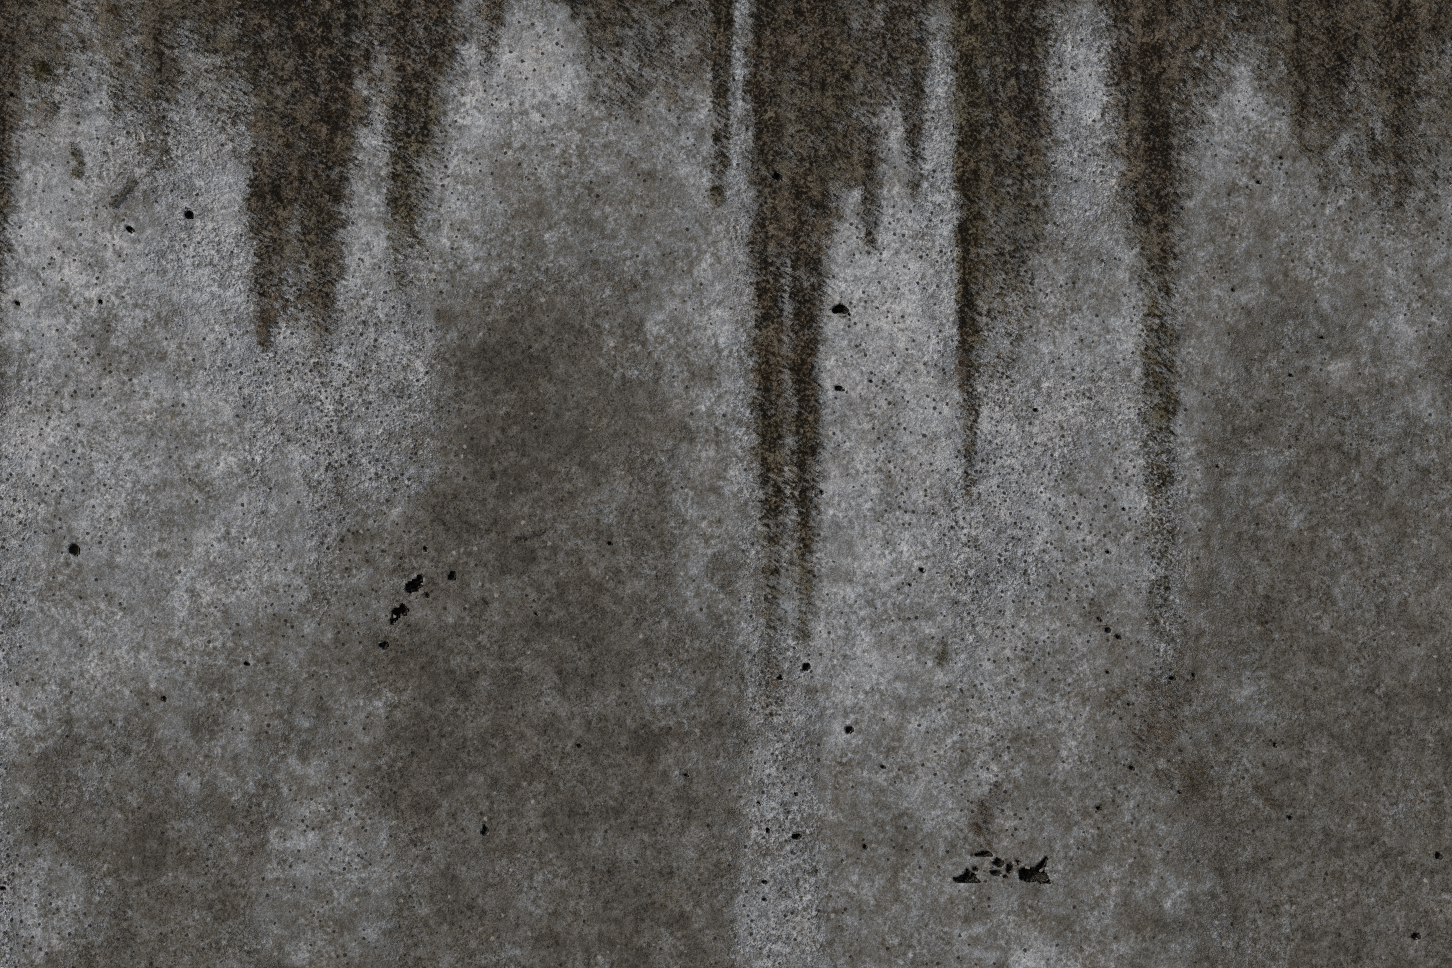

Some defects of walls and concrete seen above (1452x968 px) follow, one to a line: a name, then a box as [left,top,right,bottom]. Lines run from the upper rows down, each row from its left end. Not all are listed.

leakage [473,0,507,76]
leakage [541,0,589,23]
leakage [706,548,739,596]
leakage [0,353,335,968]
leakage [1167,286,1452,968]